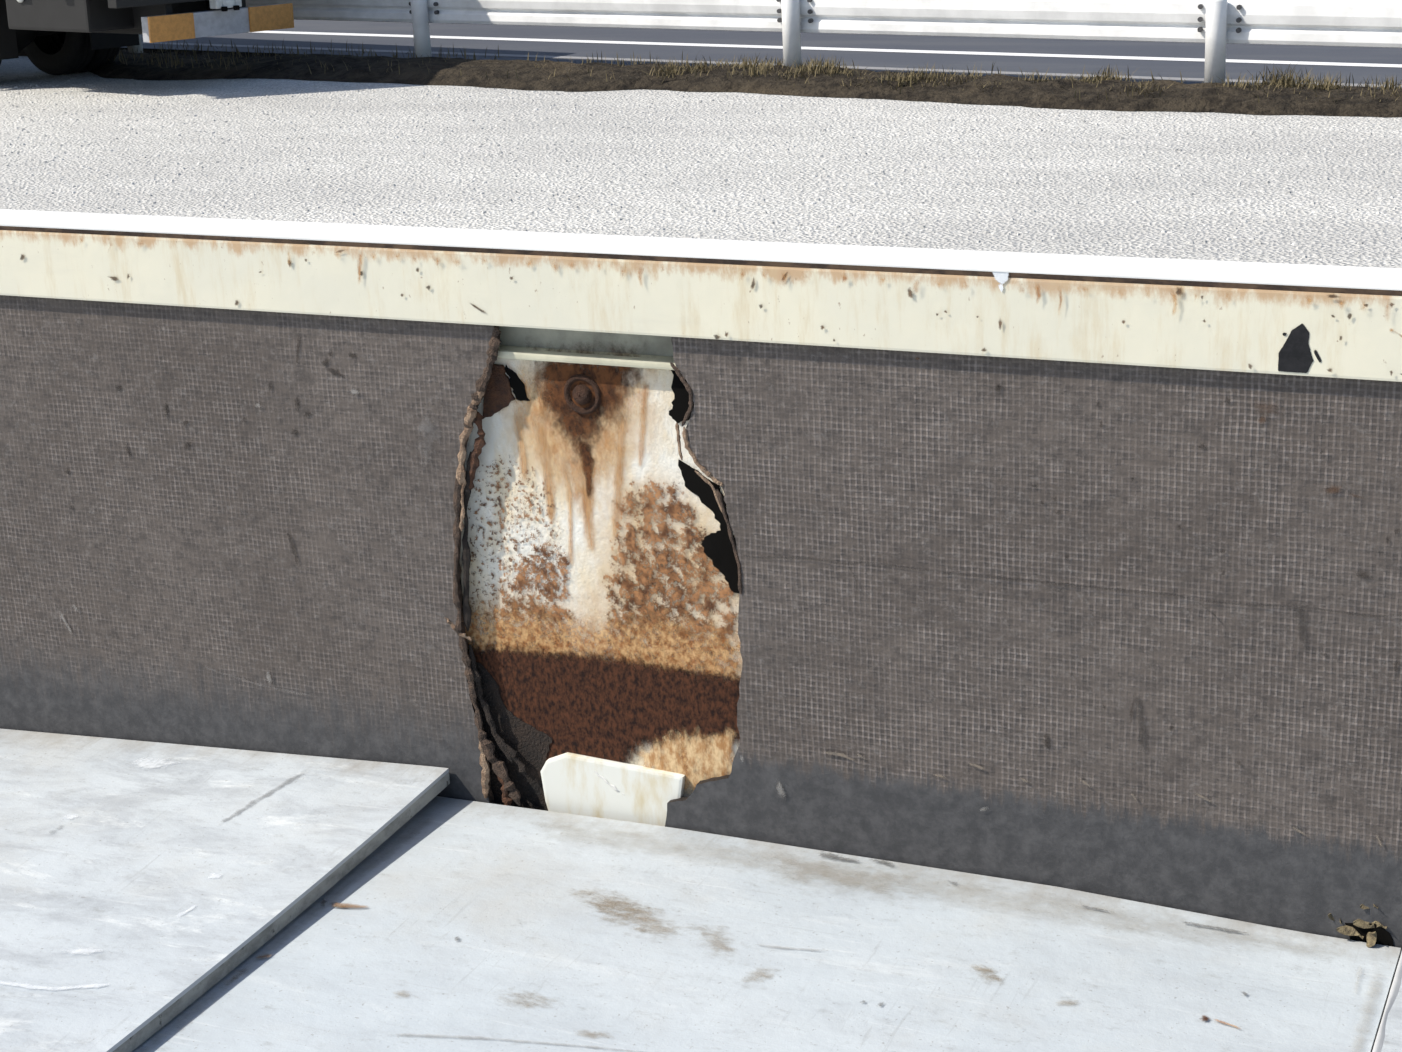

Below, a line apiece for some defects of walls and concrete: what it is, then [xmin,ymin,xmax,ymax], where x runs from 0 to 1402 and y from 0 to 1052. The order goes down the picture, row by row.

peeling [1278,324,1332,373]
corrosion [465,348,741,791]
peeling [670,362,742,594]